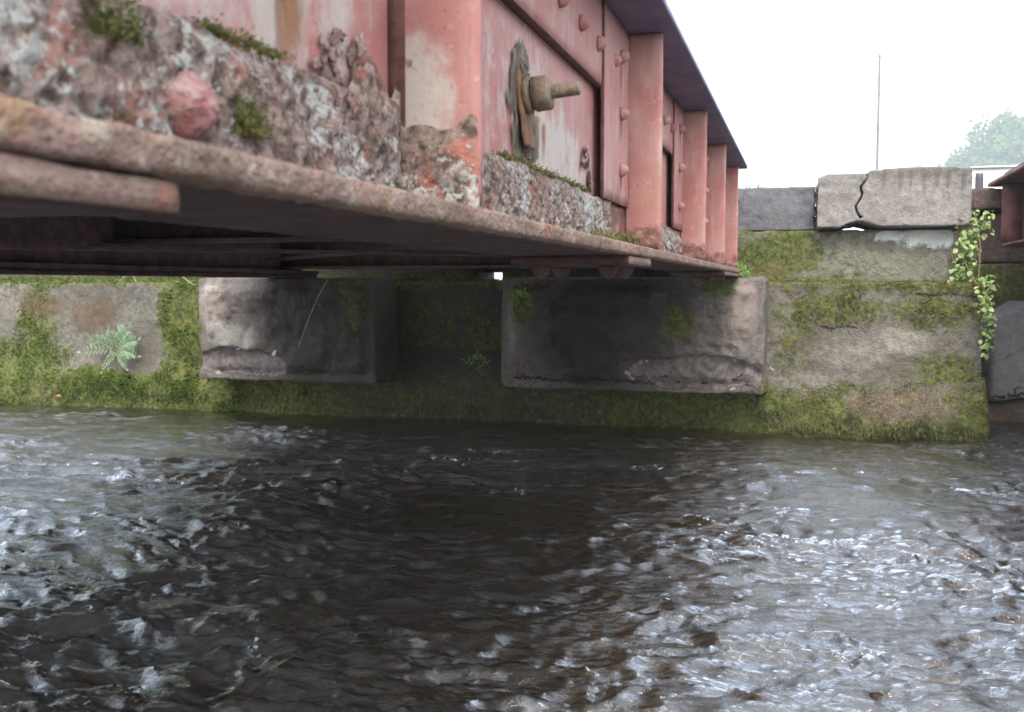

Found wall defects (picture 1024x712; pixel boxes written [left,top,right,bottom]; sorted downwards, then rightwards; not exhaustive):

peeling [279,27,390,122]
crack [813,173,867,229]
crack [512,374,752,387]
spalling [624,354,774,391]